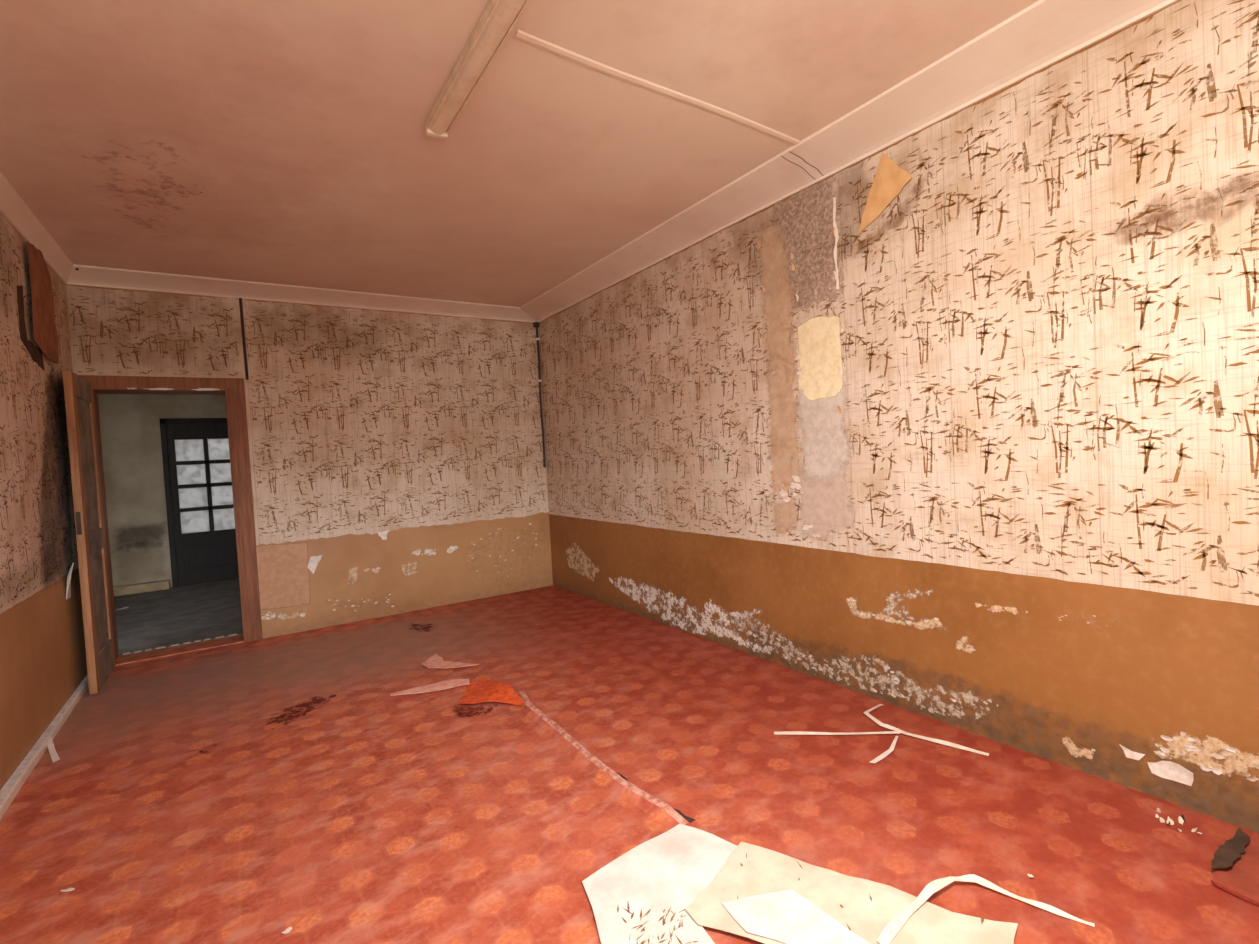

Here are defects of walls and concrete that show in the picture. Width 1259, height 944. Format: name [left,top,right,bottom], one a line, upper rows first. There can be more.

water stain [42,380,71,579]
peeling [768,464,803,502]
peeling [307,555,323,574]
peeling [347,567,381,584]
peeling [401,528,502,577]
peeling [261,609,307,621]
water stain [609,577,998,719]
peeling [1062,737,1096,759]
peeling [1119,731,1259,786]